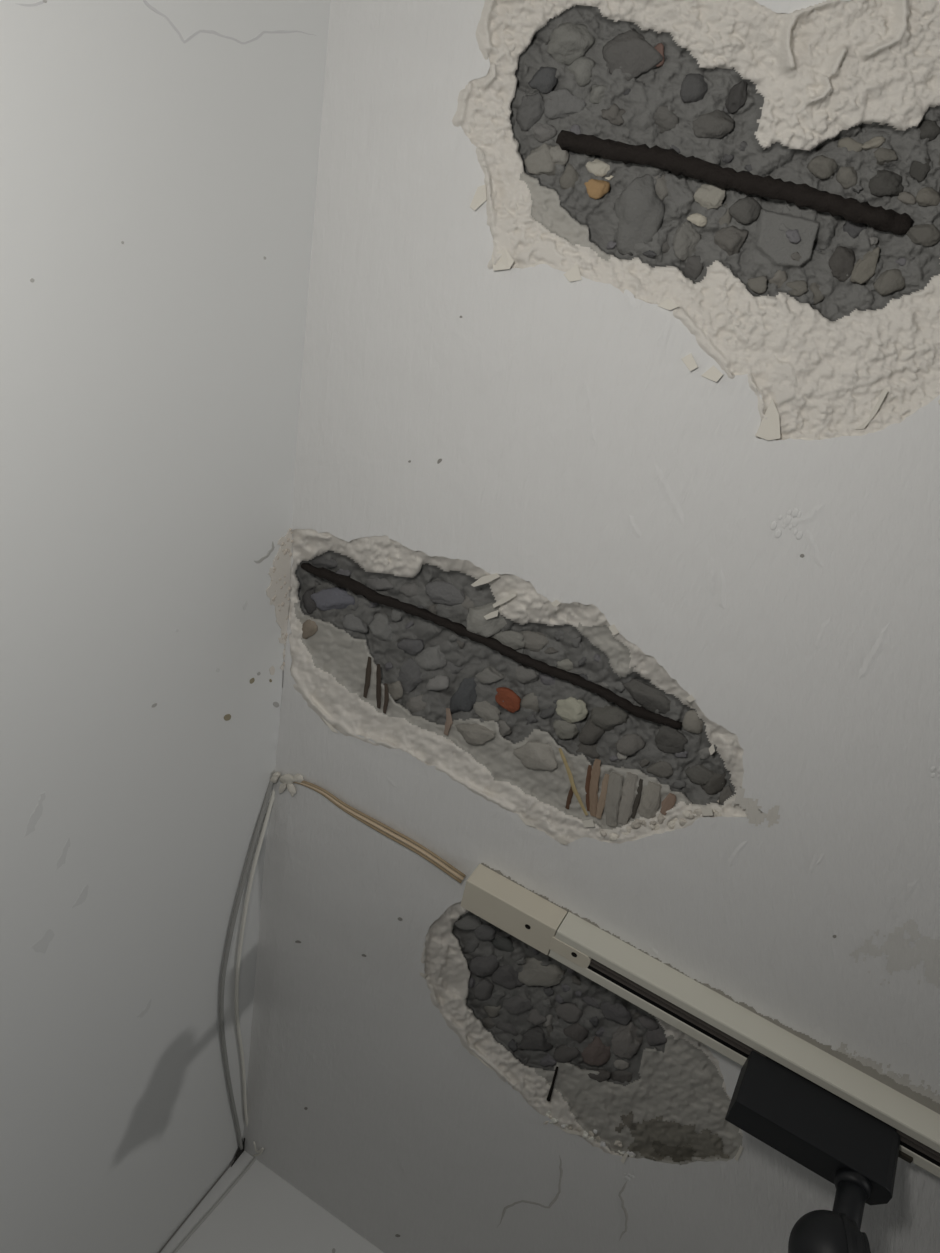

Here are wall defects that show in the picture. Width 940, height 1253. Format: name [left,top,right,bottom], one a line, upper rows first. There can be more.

crack [143,0,316,44]
spalling [452,0,940,440]
spalling [254,528,763,845]
spalling [420,902,743,1165]